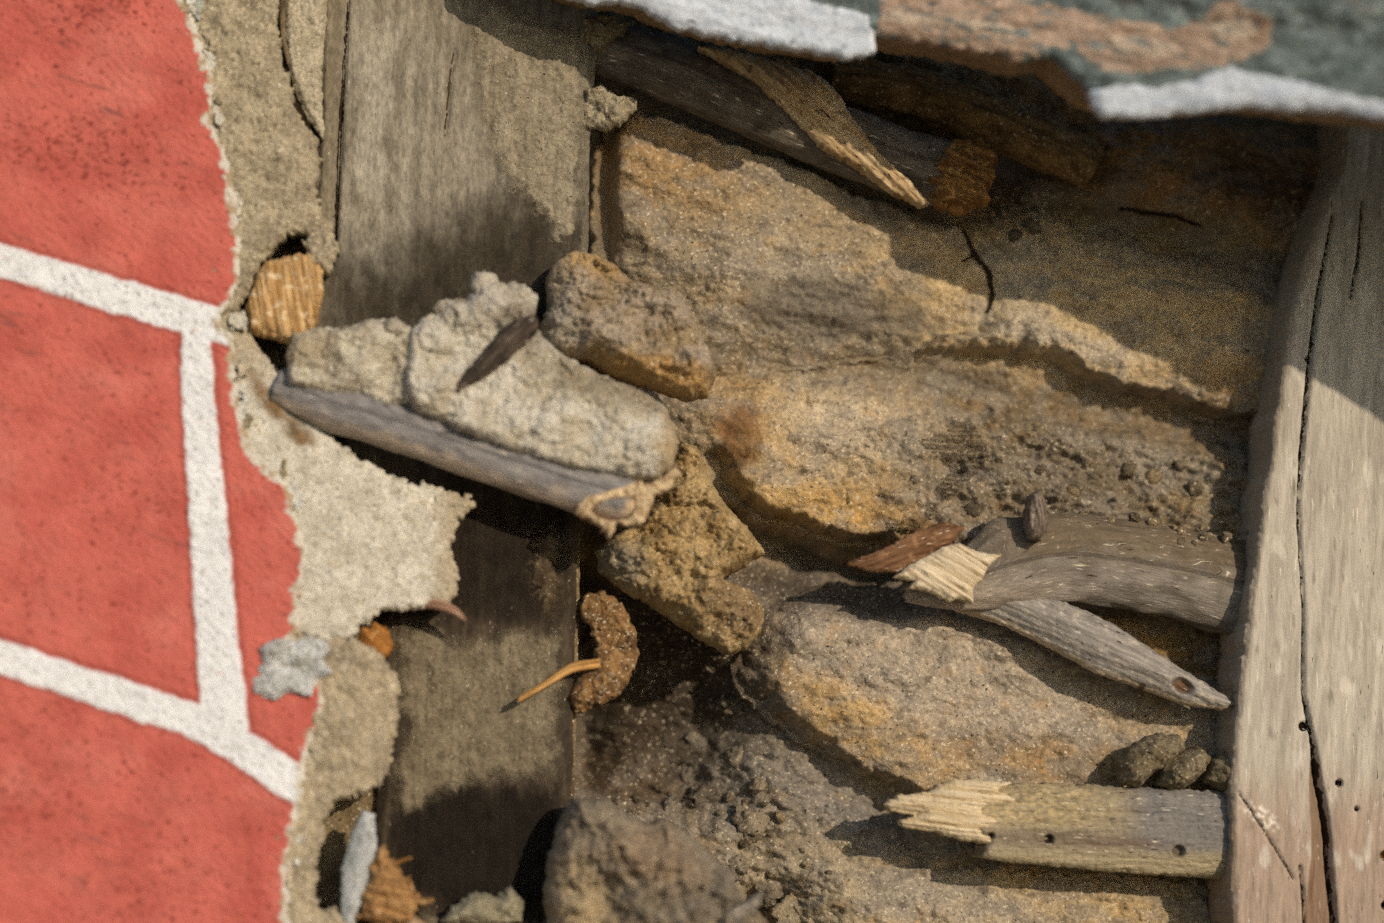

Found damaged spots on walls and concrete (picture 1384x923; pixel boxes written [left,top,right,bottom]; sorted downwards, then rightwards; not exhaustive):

peeling [874,0,1273,74]
crack [1119,207,1202,228]
crack [962,229,995,313]
flaking render [181,0,476,923]
crack [1239,205,1362,923]